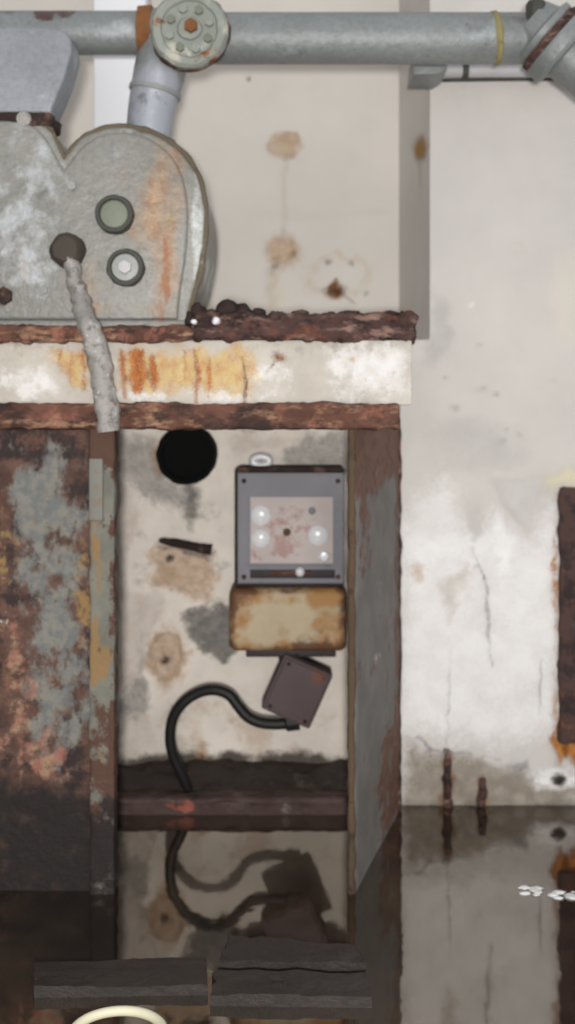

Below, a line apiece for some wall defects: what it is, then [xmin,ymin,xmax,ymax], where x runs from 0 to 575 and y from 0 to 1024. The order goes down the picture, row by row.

rust [261,130,374,312]
rust [44,346,90,392]
rust [112,342,291,405]
crack [468,546,495,667]
rust [549,493,575,768]